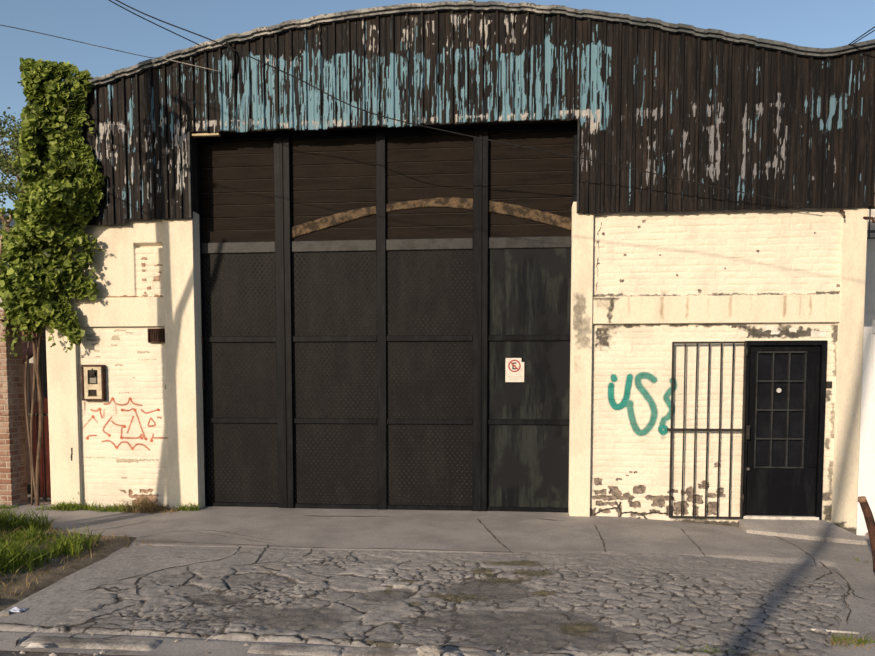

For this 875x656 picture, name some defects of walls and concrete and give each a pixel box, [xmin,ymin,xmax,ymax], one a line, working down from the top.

peeling [95,13,622,218]
peeling [629,51,728,205]
peeling [737,93,794,201]
peeling [804,59,865,172]
peeling [141,257,162,294]
flaking render [760,324,798,335]
flaking render [811,325,838,352]
peeling [590,471,726,518]
crack [0,521,875,656]